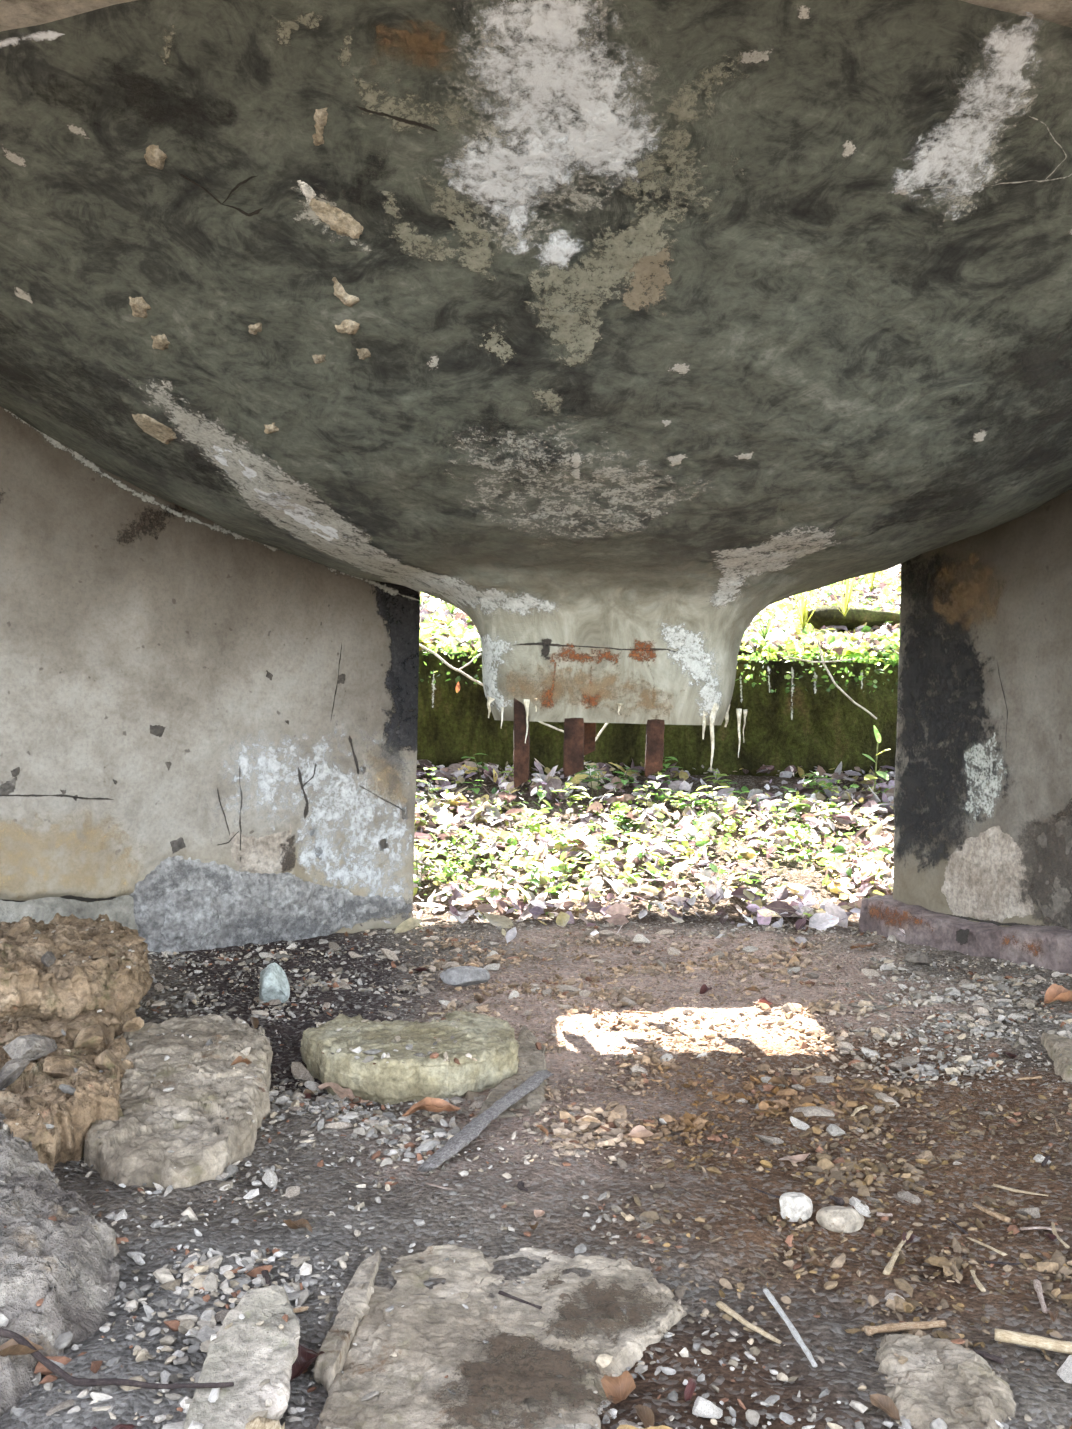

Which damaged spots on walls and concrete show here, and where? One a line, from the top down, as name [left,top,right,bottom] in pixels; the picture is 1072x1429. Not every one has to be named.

leakage [444,0,657,266]
leakage [894,12,1038,220]
peeling [381,175,505,281]
peeling [524,49,772,367]
peeling [480,327,516,363]
peeling [530,388,563,416]
leakage [121,376,559,794]
rust [539,640,657,709]
leakage [661,622,722,717]
leakage [893,553,1013,871]
crack [0,793,113,801]
peeling [941,802,1072,930]